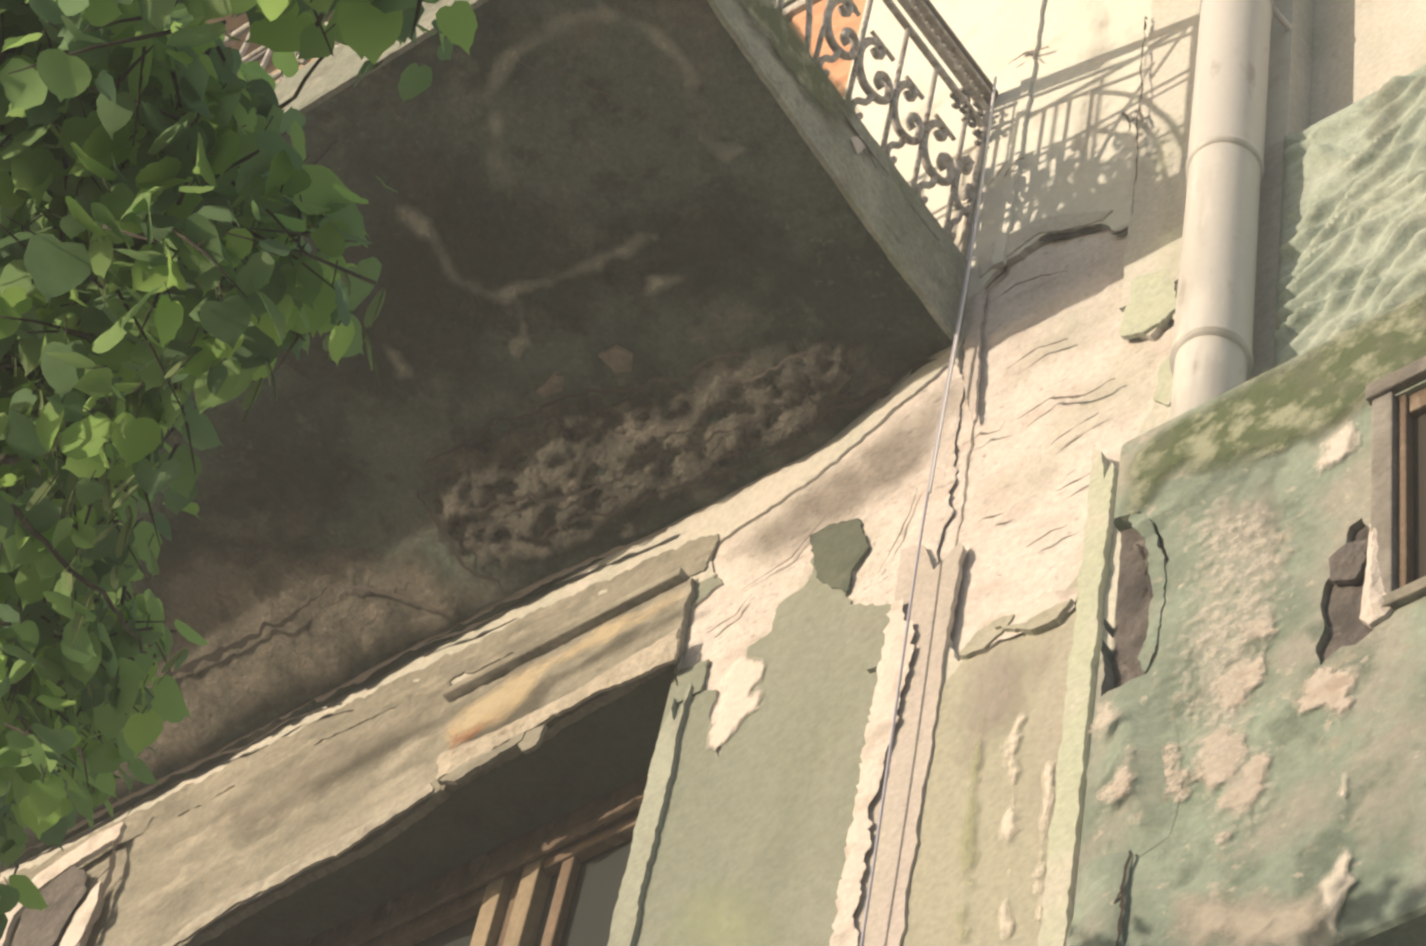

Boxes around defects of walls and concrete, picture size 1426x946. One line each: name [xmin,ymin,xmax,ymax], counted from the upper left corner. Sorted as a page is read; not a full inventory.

crack [1009,46,1049,64]
crack [987,157,1024,187]
crack [1039,15,1148,241]
crack [985,262,1008,289]
water stain [1319,424,1355,469]
spalling [112,210,1177,946]
peeling [1211,616,1273,710]
spalling [1296,525,1373,717]
crack [1,527,669,946]
peeling [1162,727,1270,813]
crack [1114,850,1133,946]